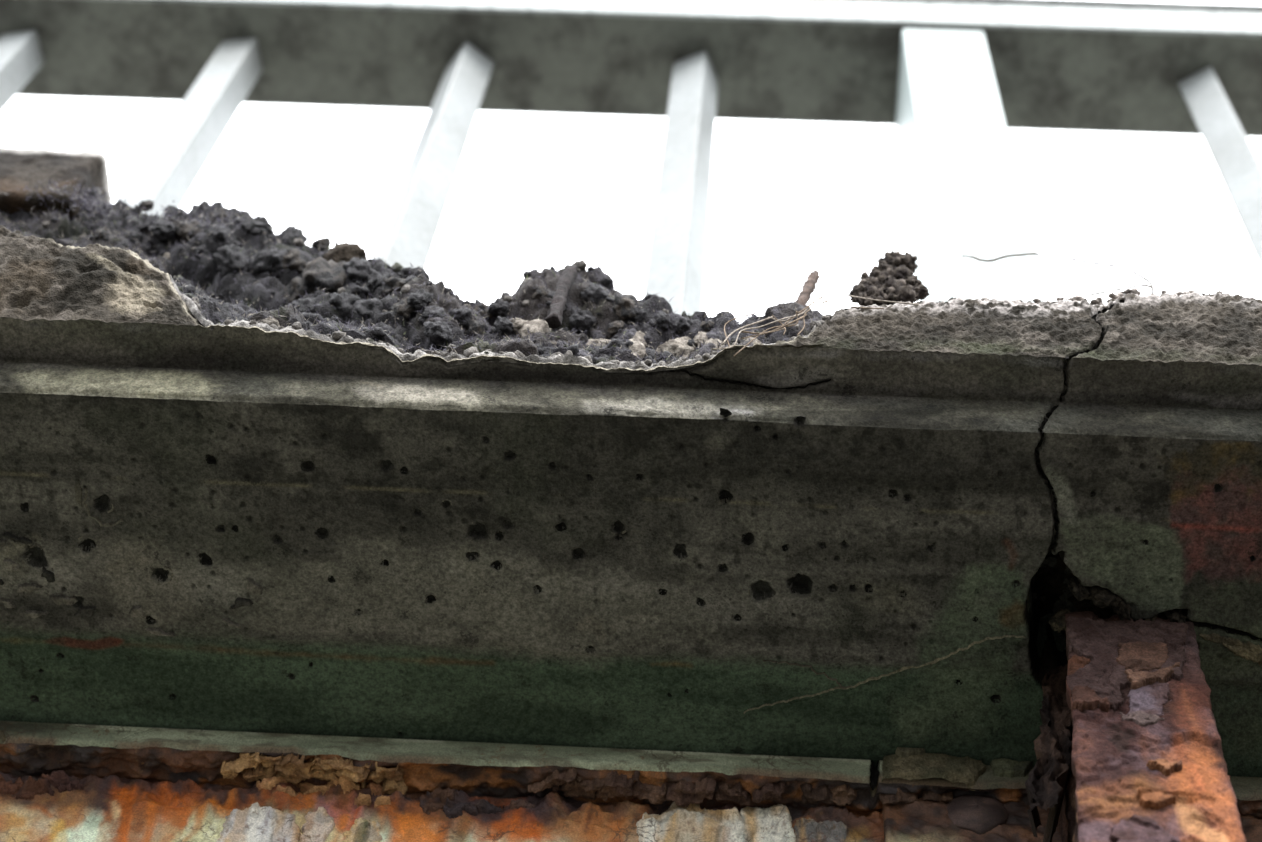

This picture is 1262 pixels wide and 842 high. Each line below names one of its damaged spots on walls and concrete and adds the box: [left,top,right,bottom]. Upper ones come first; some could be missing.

spalling [0,187,859,373]
crack [667,370,831,389]
crack [1035,299,1125,556]
crack [1190,620,1262,665]
rust [1066,616,1246,842]
peeling [0,770,88,800]
peeling [216,752,408,842]
rust [0,771,671,842]
rust [700,804,741,813]
peeling [596,770,847,842]
rust [789,806,884,842]